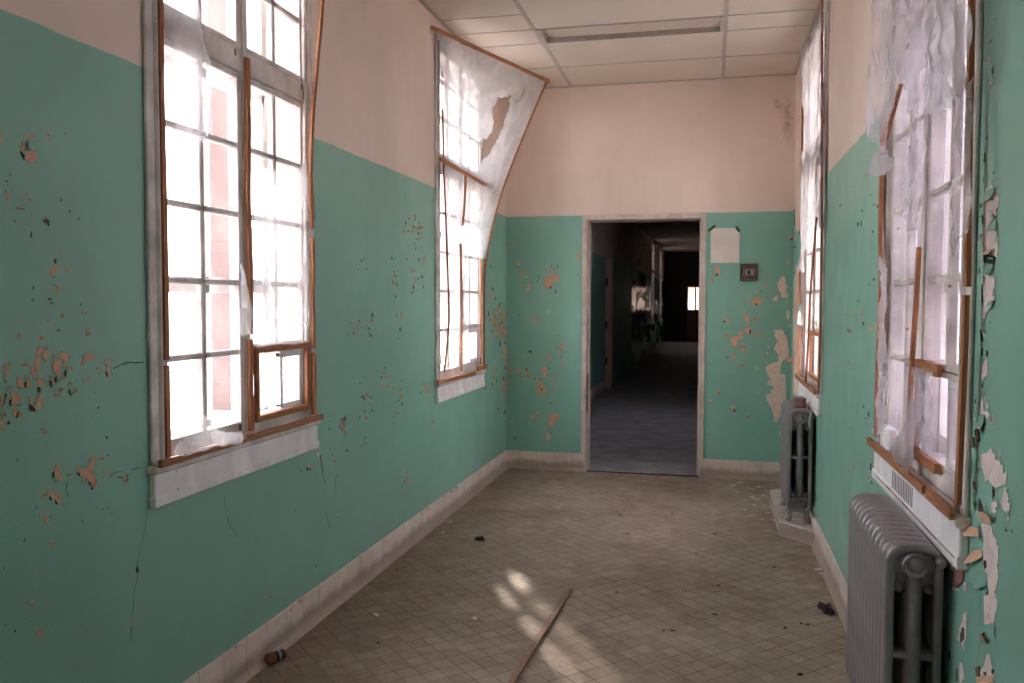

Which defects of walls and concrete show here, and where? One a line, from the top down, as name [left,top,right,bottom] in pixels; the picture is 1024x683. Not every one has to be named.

peeling [20,133,52,166]
peeling [0,336,111,432]
peeling [387,212,426,339]
peeling [485,258,566,441]
peeling [723,206,801,435]
peeling [946,153,1012,683]
peeling [36,454,129,525]
crack [129,504,150,644]